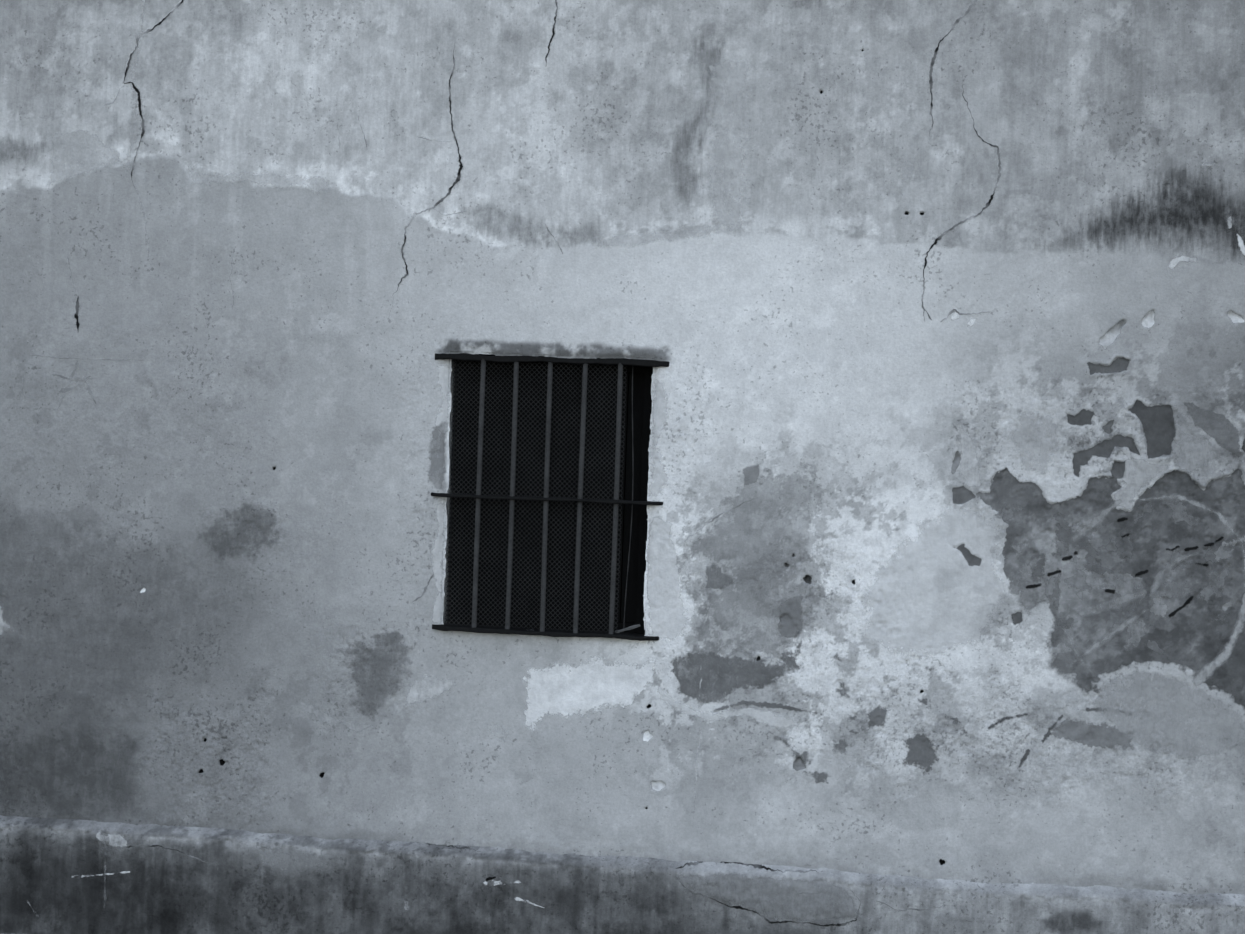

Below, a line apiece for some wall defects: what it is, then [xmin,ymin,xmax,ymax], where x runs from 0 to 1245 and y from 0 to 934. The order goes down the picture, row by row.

crack [545,0,558,63]
crack [123,0,183,256]
crack [388,47,463,321]
crack [922,4,1001,326]
leakage [1089,178,1245,250]
peeling [1087,321,1129,375]
spalling [1227,310,1245,323]
peeling [951,400,1245,768]
leakage [352,632,407,711]
peeling [779,739,828,783]
crack [676,861,817,872]
leakage [1049,913,1095,931]